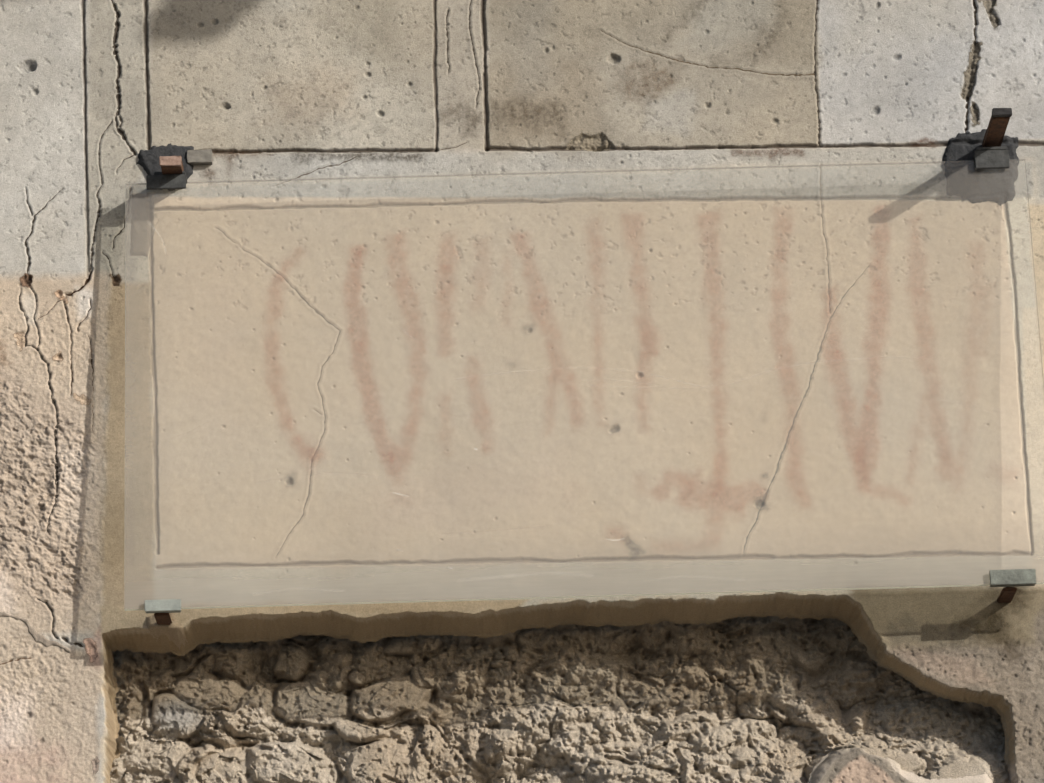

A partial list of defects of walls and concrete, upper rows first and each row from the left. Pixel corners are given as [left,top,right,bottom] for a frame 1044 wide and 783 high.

crack [965,0,977,133]
crack [19,0,136,533]
crack [217,228,341,556]
crack [601,0,870,553]
crack [0,599,83,665]